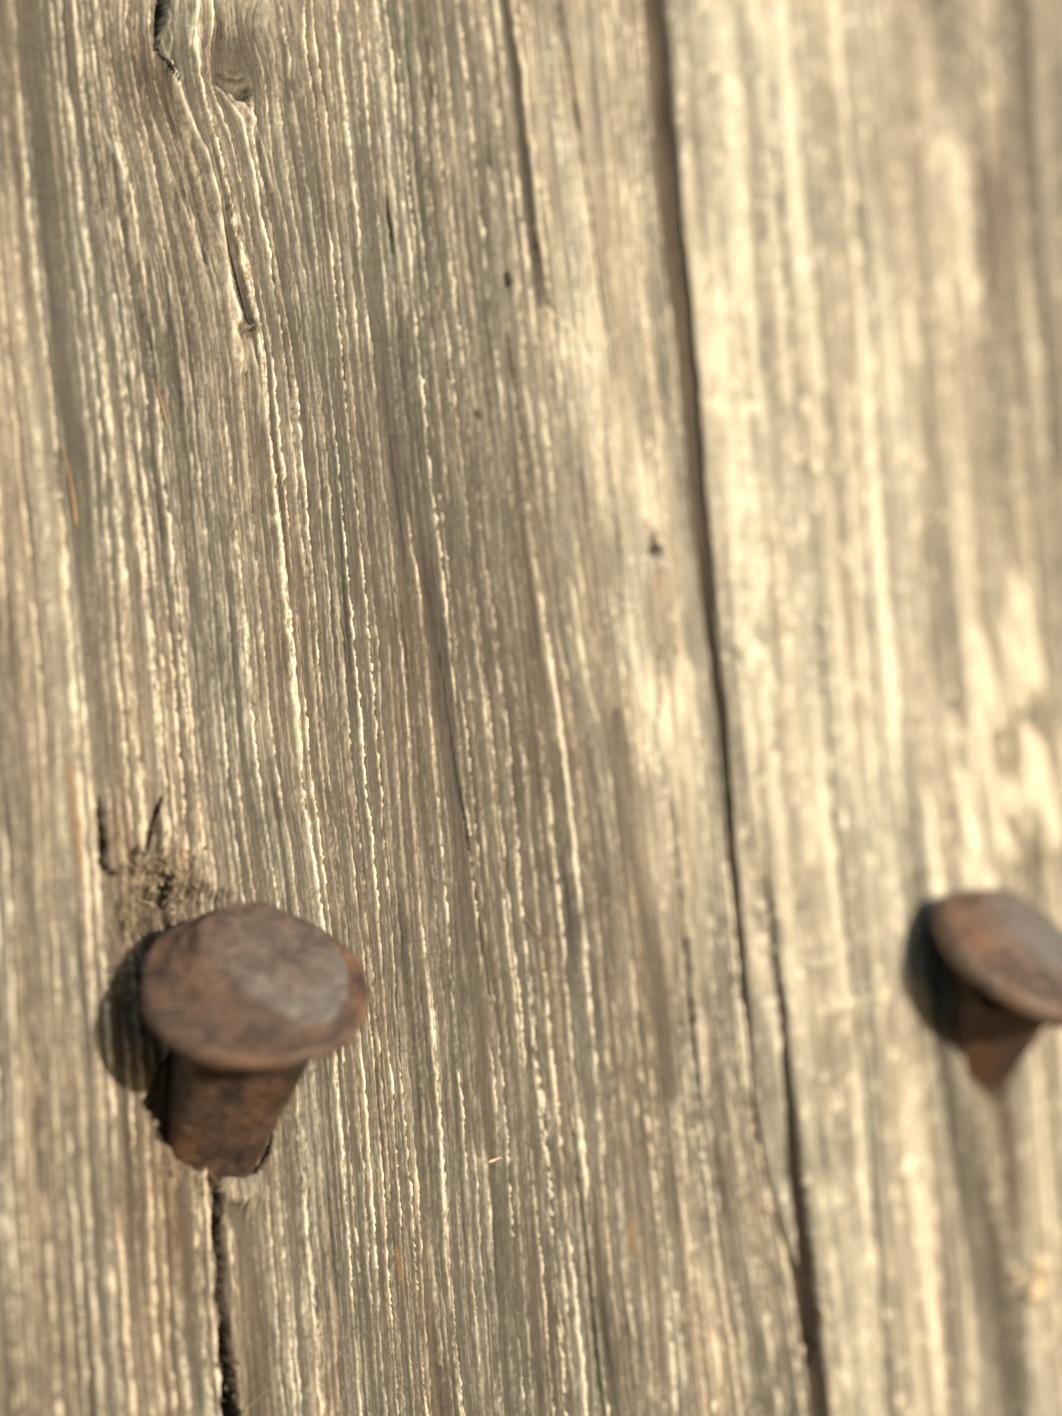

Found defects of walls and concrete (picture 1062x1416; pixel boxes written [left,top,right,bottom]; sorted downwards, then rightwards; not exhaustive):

crack [153,0,180,81]
crack [224,224,252,331]
crack [251,1134,273,1174]
crack [210,1187,235,1416]